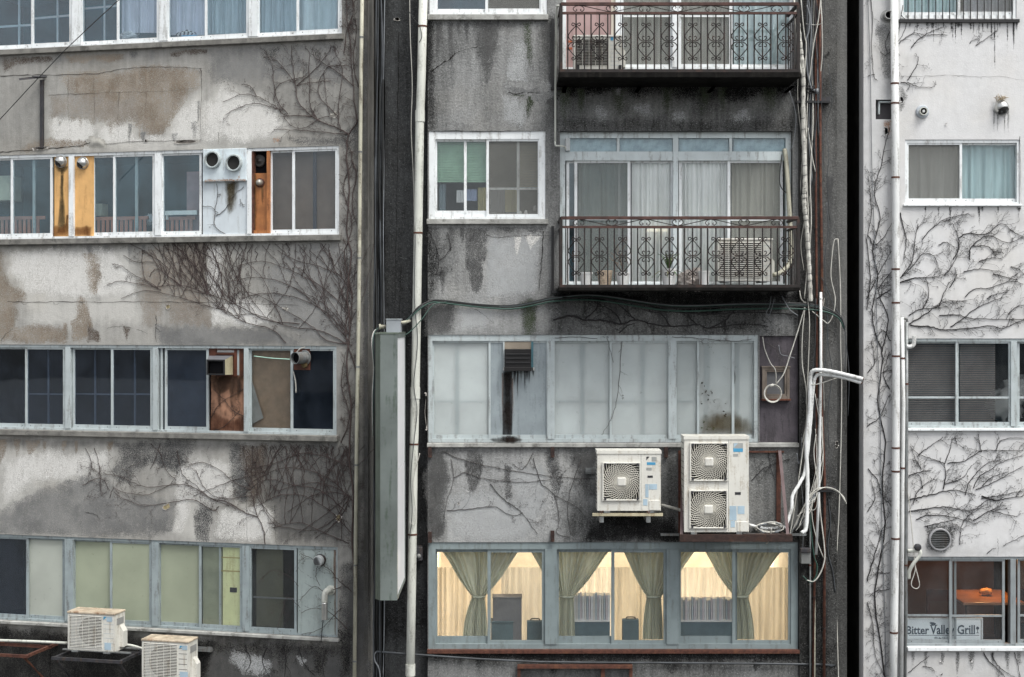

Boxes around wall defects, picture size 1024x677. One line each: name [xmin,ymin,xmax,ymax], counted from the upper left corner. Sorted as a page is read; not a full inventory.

leakage [435,22,500,81]
leakage [909,23,1017,62]
leakage [0,0,370,546]
leakage [426,227,543,294]
leakage [503,370,534,442]